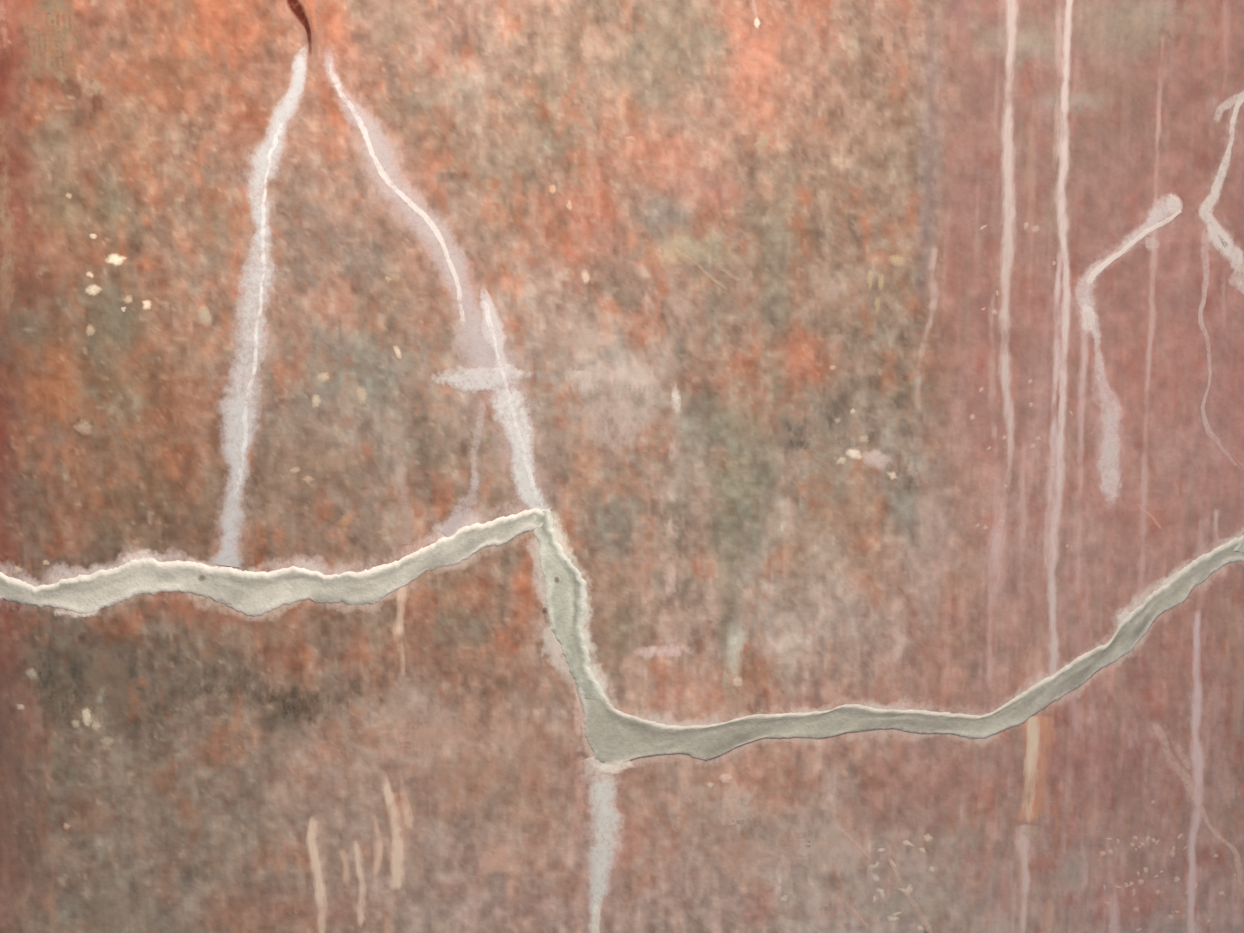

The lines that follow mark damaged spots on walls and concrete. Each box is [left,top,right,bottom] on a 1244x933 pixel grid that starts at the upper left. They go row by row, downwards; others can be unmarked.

crack [288,0,316,43]
damp [1007,0,1016,90]
damp [1000,106,1032,329]
crack [0,55,1244,772]
damp [1002,353,1013,449]
damp [1049,0,1087,676]
damp [1146,289,1154,389]
crack [589,776,623,933]